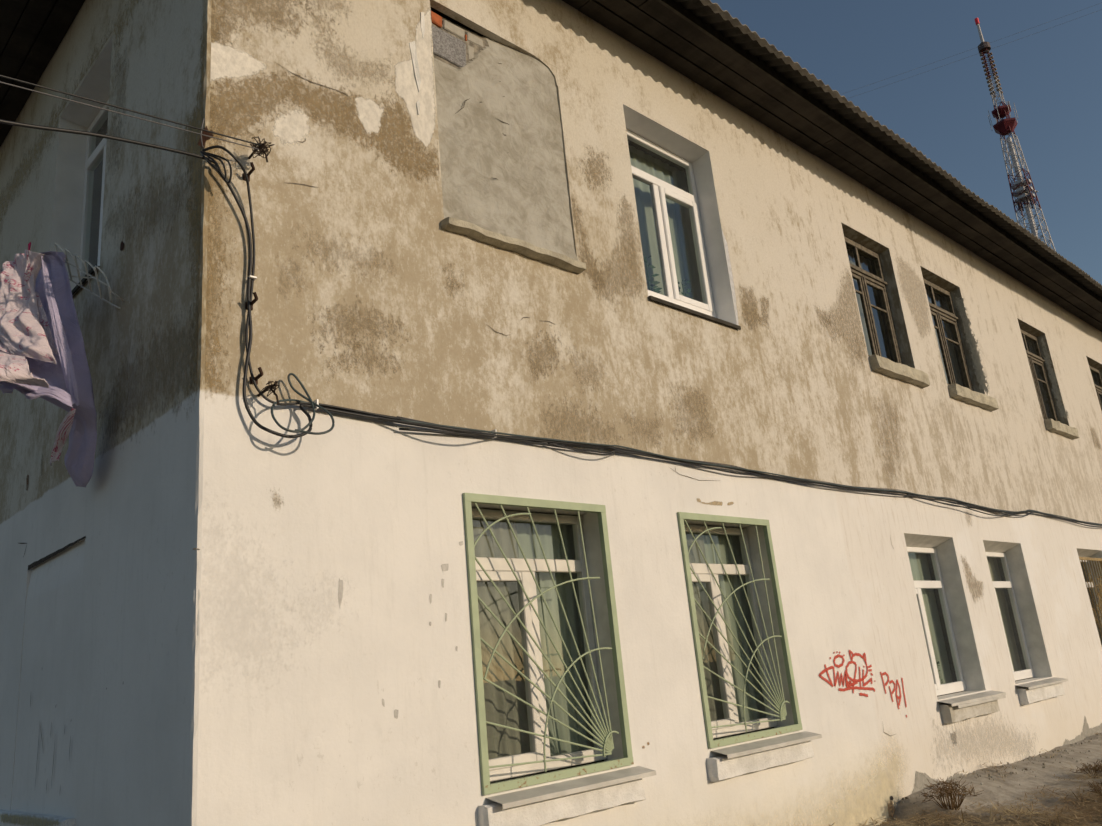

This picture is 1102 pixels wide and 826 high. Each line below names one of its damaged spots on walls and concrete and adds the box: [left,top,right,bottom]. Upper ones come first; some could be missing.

peeling [409,12,425,115]
damp [183,0,439,393]
damp [572,199,603,288]
damp [740,286,769,330]